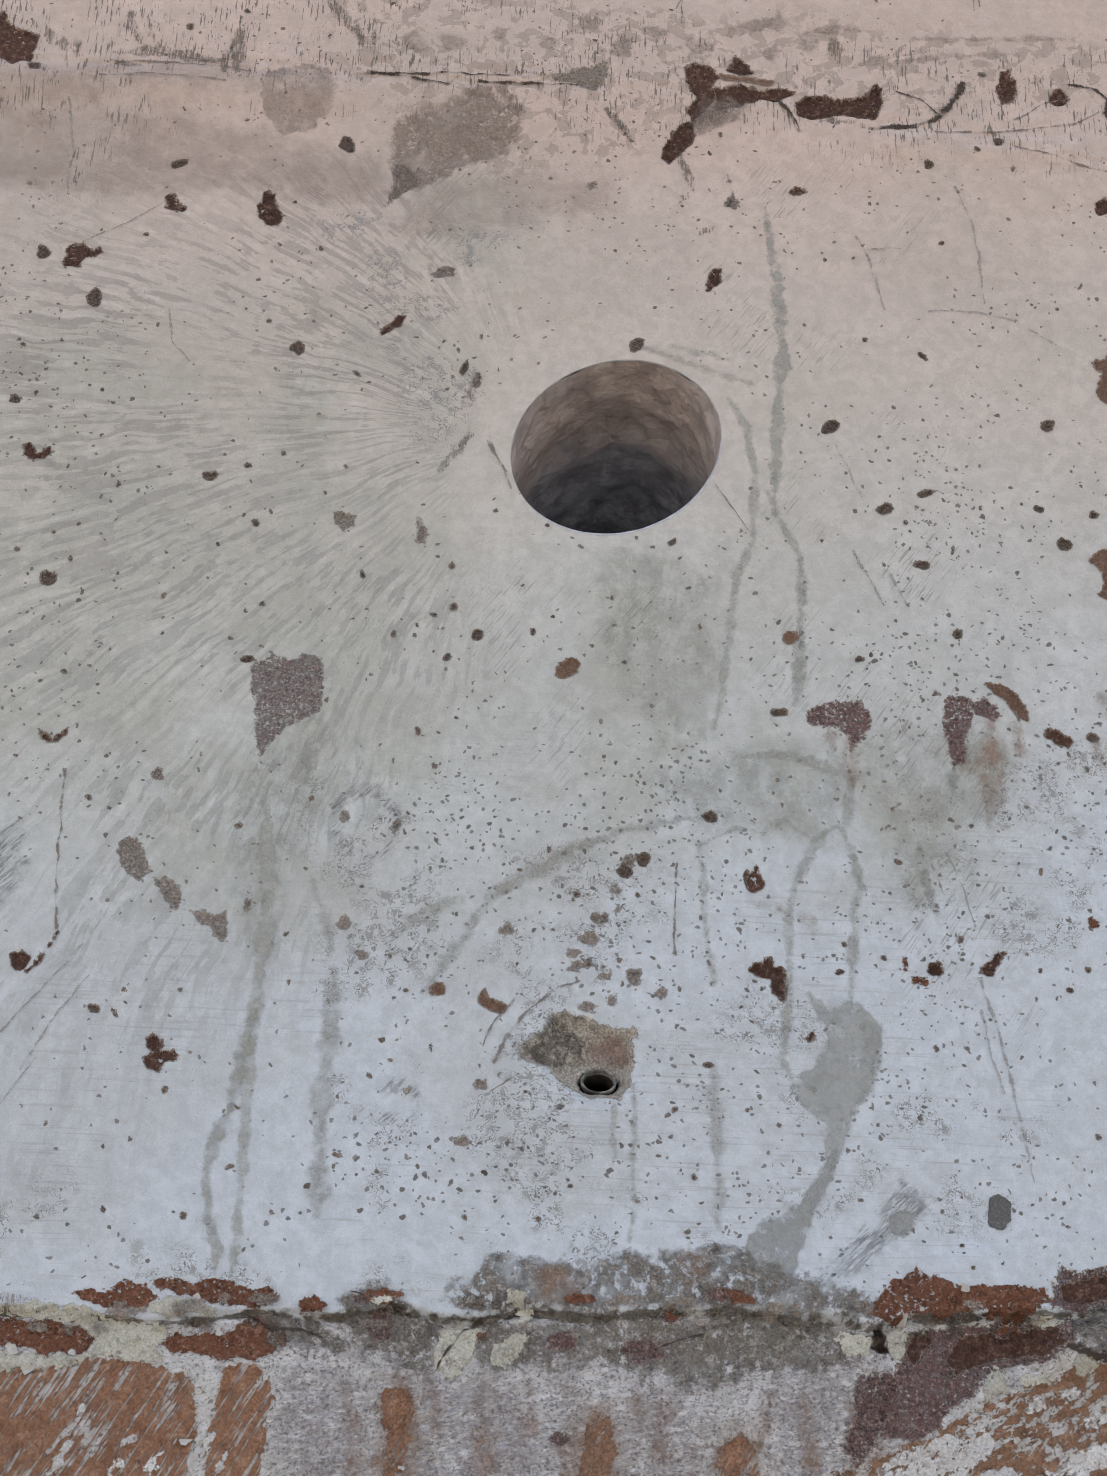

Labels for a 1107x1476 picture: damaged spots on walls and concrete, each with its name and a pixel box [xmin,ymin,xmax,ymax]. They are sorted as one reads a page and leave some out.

spalling [0,10,41,69]
spalling [661,44,884,164]
spalling [1057,537,1073,551]
spalling [1089,549,1107,600]
spalling [241,653,324,756]
spalling [806,699,872,753]
spalling [932,682,1100,770]
spalling [9,930,60,974]
spalling [478,988,507,1014]
peeling [0,1000,1107,1476]
crack [0,1291,790,1370]
crack [826,1308,1107,1363]